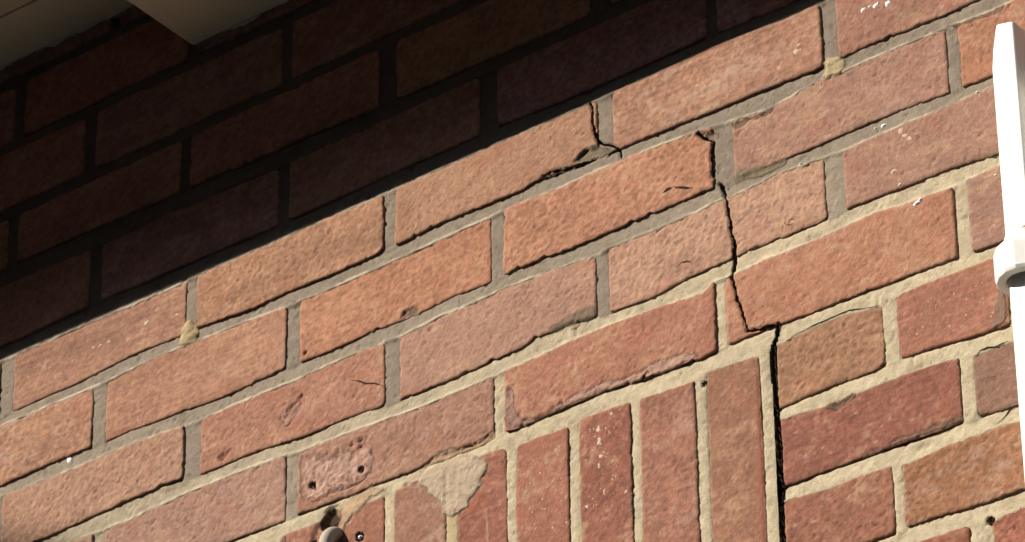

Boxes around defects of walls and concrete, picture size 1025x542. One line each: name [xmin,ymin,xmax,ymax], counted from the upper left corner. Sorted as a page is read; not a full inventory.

crack [663,132,878,542]